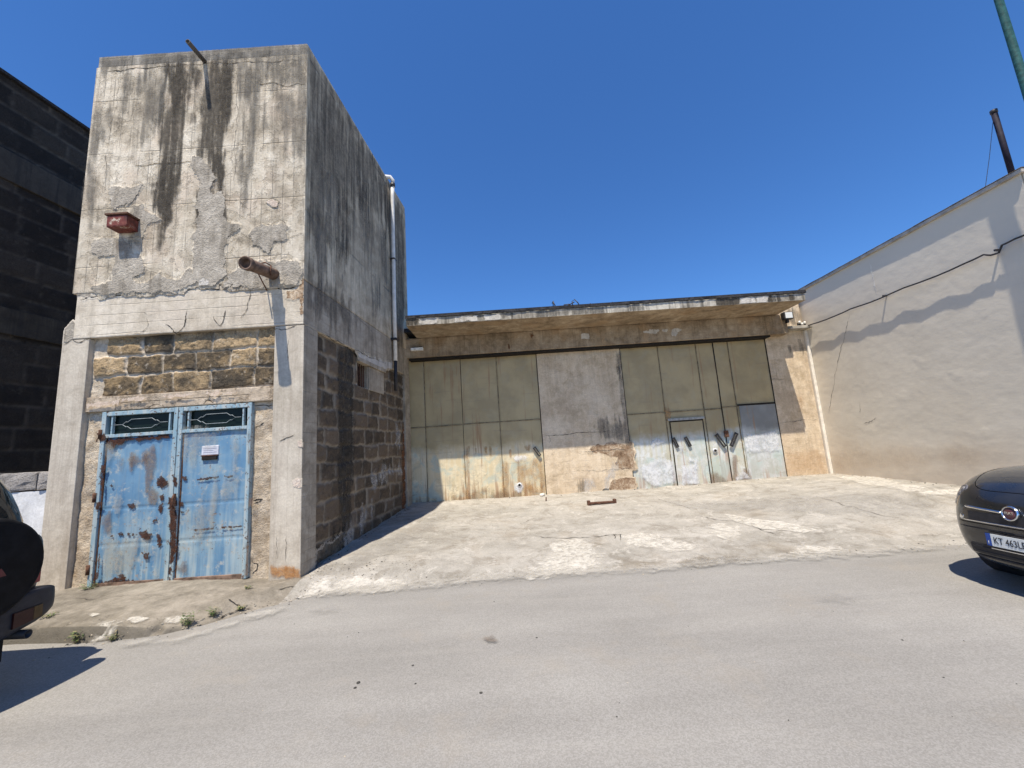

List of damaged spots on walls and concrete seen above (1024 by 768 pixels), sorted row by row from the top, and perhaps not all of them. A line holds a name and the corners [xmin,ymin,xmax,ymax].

damp [87,43,419,348]
spalling [77,155,304,319]
rust [95,464,113,510]
rust [96,432,169,450]
spalling [586,441,638,491]
rust [110,475,233,580]
rust [93,554,134,583]